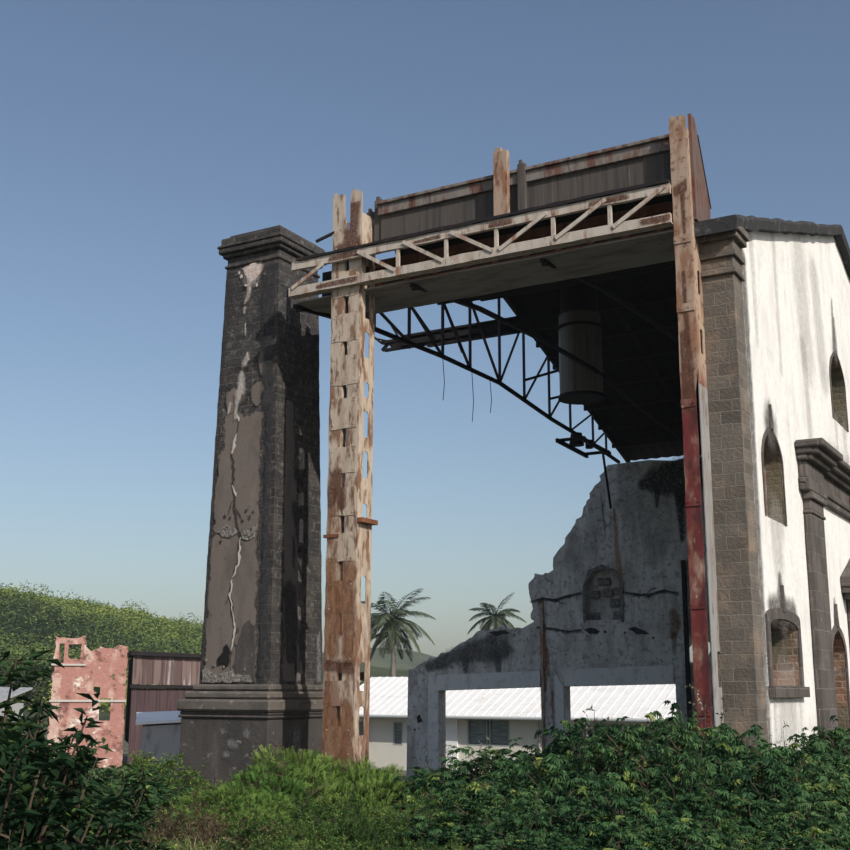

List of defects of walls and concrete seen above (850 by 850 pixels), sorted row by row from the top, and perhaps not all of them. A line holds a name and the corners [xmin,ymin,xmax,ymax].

spalling [238,263,266,287]
rust [316,201,361,288]
rust [673,179,687,233]
rust [680,271,696,411]
flaking render [202,350,266,684]
crack [226,414,242,671]
rust [328,468,346,542]
leakage [675,490,685,541]
rust [322,559,355,763]